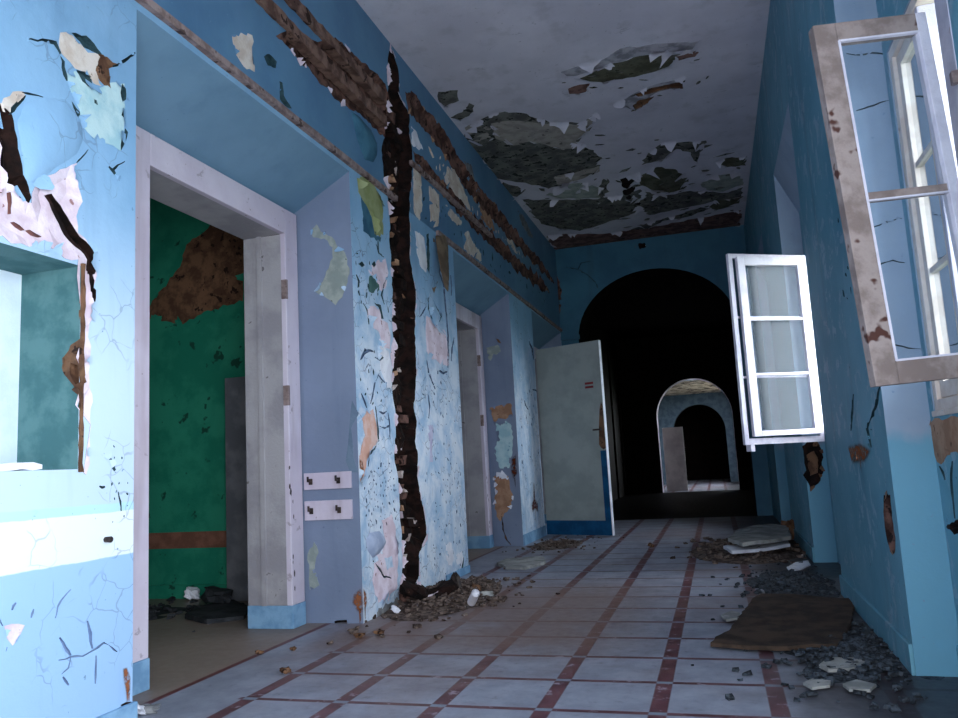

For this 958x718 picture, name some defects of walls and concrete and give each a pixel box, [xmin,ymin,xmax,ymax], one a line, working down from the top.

peeling [59,31,128,151]
peeling [561,40,709,112]
peeling [437,90,748,250]
flaking render [0,91,100,474]
peeling [149,225,244,325]
flaking render [276,31,562,617]
flaking render [802,442,825,491]
flaking render [883,491,895,555]
peeling [929,416,958,535]
crack [0,589,117,685]